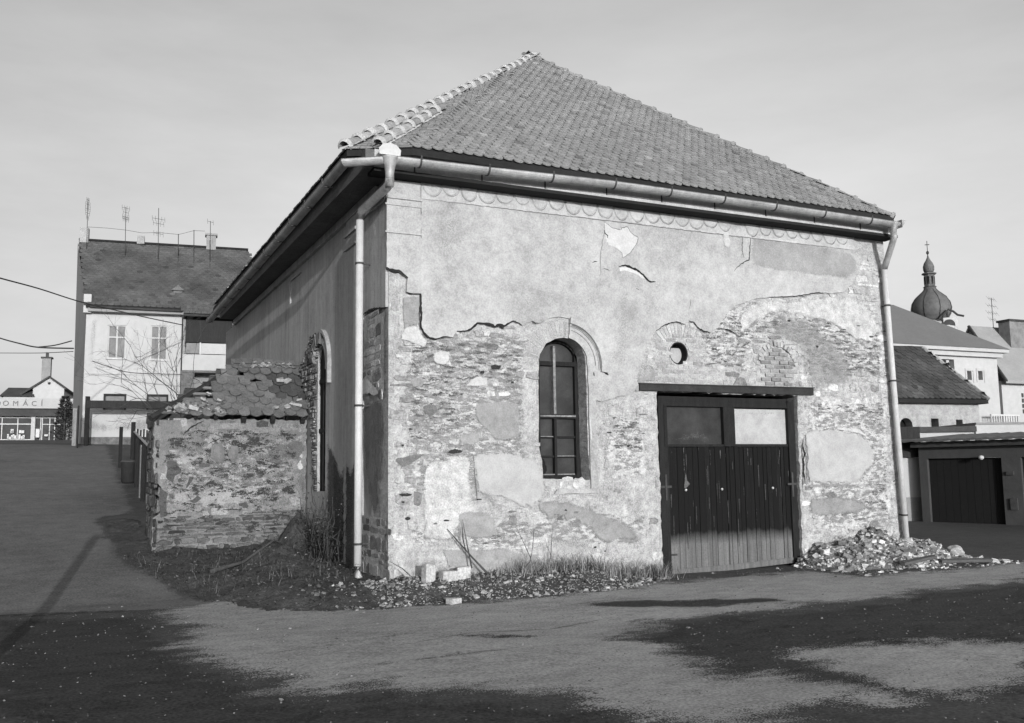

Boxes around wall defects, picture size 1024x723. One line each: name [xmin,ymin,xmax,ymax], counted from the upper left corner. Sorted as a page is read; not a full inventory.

crack [592,221,655,290]
flaking render [604,223,644,279]
spalling [359,273,661,580]
spalling [707,255,901,555]
spalling [152,461,304,552]